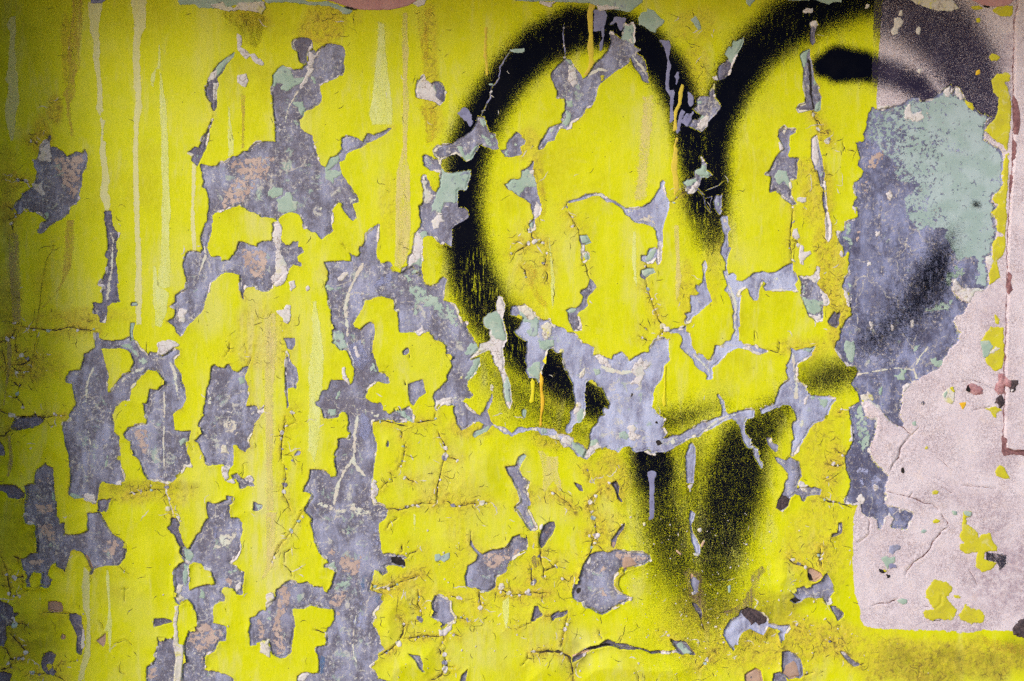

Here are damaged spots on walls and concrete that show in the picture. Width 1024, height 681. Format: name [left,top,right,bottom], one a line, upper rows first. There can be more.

peeling [505,0,664,231]
crack [669,12,715,78]
peeling [690,37,744,132]
peeling [788,0,842,113]
peeling [0,33,392,681]
crack [220,296,285,379]
peeling [248,72,1014,681]
crack [370,355,898,681]